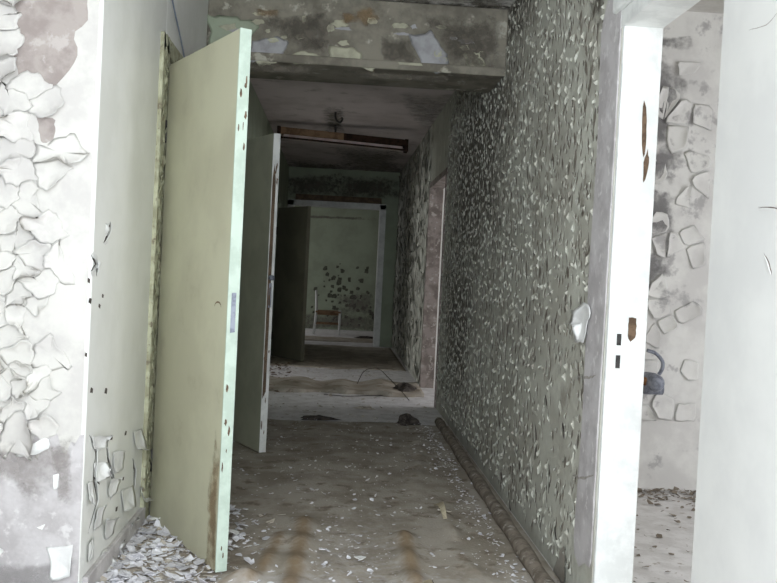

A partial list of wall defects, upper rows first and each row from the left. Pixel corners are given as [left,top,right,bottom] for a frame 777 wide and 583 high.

leakage [250,63,309,73]
leakage [268,14,325,50]
leakage [382,40,413,62]
leakage [375,0,525,44]
leakage [439,24,496,67]
leakage [288,152,400,197]
leakage [453,80,509,242]
peeling [391,127,433,383]
crack [763,254,772,275]
flaking render [0,0,172,583]
peeling [435,0,622,583]
leakage [445,274,468,387]